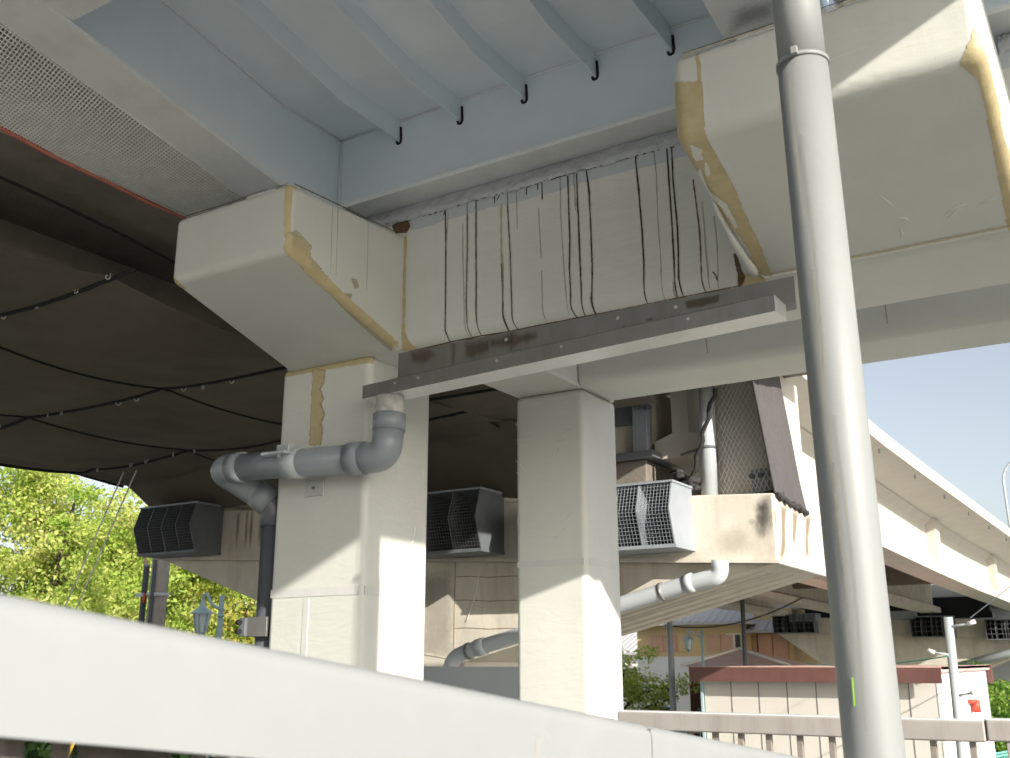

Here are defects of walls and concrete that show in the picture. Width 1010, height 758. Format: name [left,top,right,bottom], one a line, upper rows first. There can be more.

corrosion [392,220,410,234]
damp [466,200,481,336]
peeling [178,23,797,352]
damp [494,193,518,331]
damp [567,170,597,317]
damp [635,157,648,303]
damp [666,148,684,298]
damp [692,179,718,292]
peeling [850,27,1010,259]
peeling [284,357,374,445]